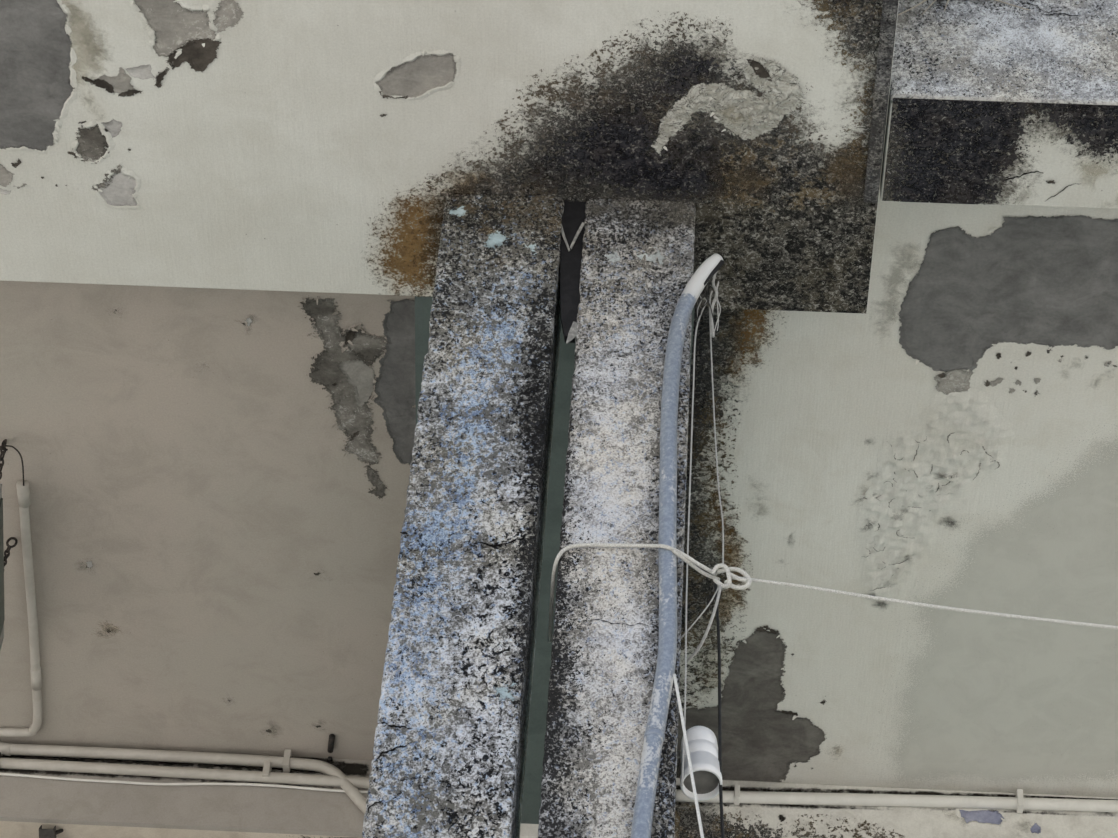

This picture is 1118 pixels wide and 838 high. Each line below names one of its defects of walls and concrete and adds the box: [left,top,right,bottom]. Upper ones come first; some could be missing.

spalling [53,119,131,165]
peeling [82,0,244,97]
peeling [373,49,461,101]
peeling [651,58,805,155]
peeling [297,295,388,499]
leakage [414,0,1118,713]
spalling [1009,351,1041,395]
leakage [883,432,1118,788]